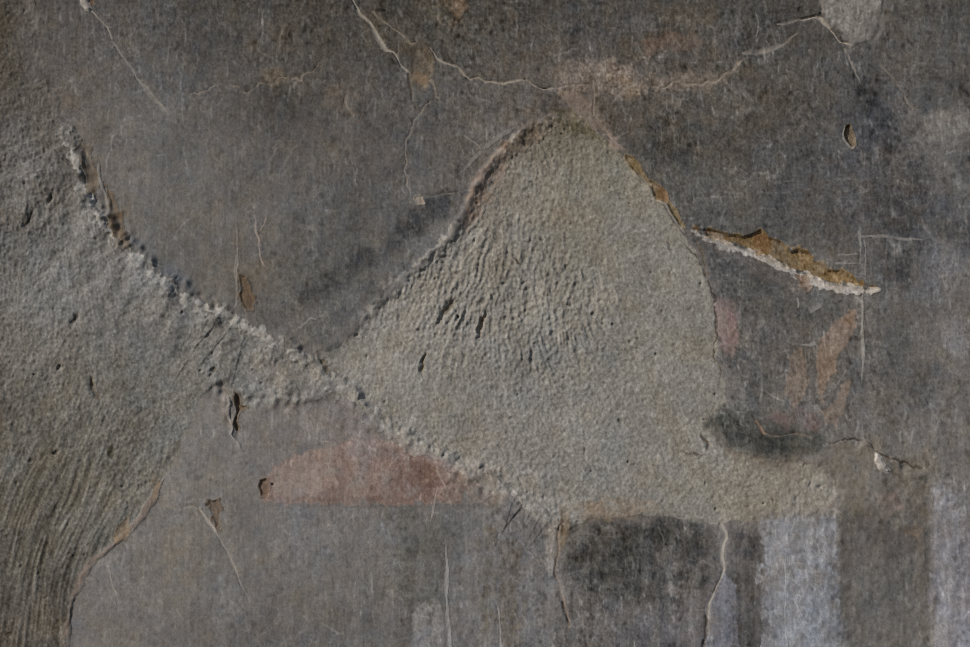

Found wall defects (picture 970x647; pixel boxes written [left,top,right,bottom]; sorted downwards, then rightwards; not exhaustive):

crack [352,0,619,197]
peeling [387,182,469,284]
flaking render [624,153,882,300]
flaking render [314,349,331,376]
spalling [416,350,427,378]
spalling [434,298,460,325]
spalling [473,308,487,342]
crack [554,523,571,647]
crack [701,522,729,647]